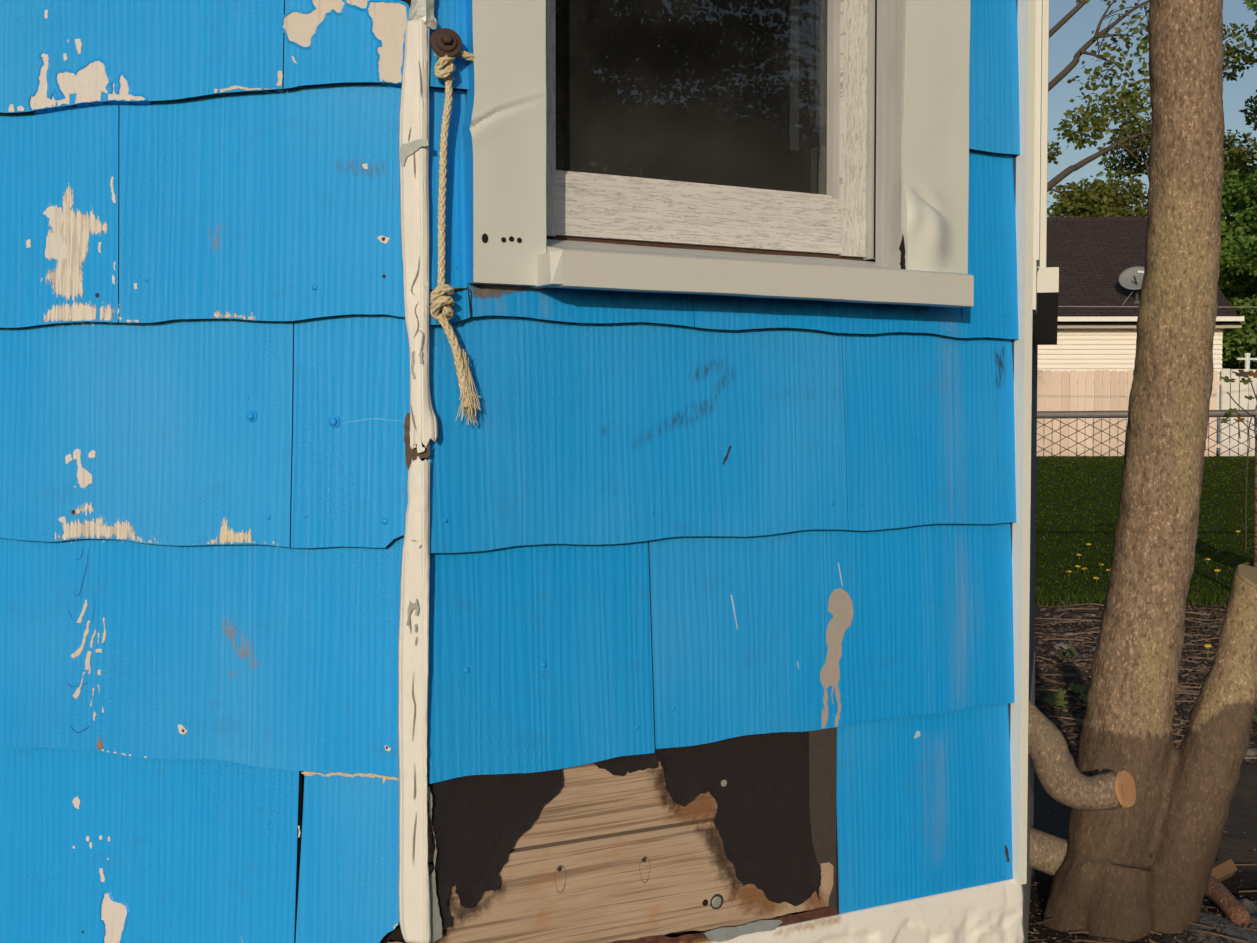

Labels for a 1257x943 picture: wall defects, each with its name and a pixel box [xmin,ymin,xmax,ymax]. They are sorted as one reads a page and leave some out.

peeling [9,38,152,115]
peeling [214,70,284,93]
peeling [280,0,411,89]
peeling [26,186,139,327]
peeling [55,449,159,543]
peeling [207,517,280,547]
peeling [71,600,106,721]
peeling [99,858,130,943]
peeling [704,920,782,942]